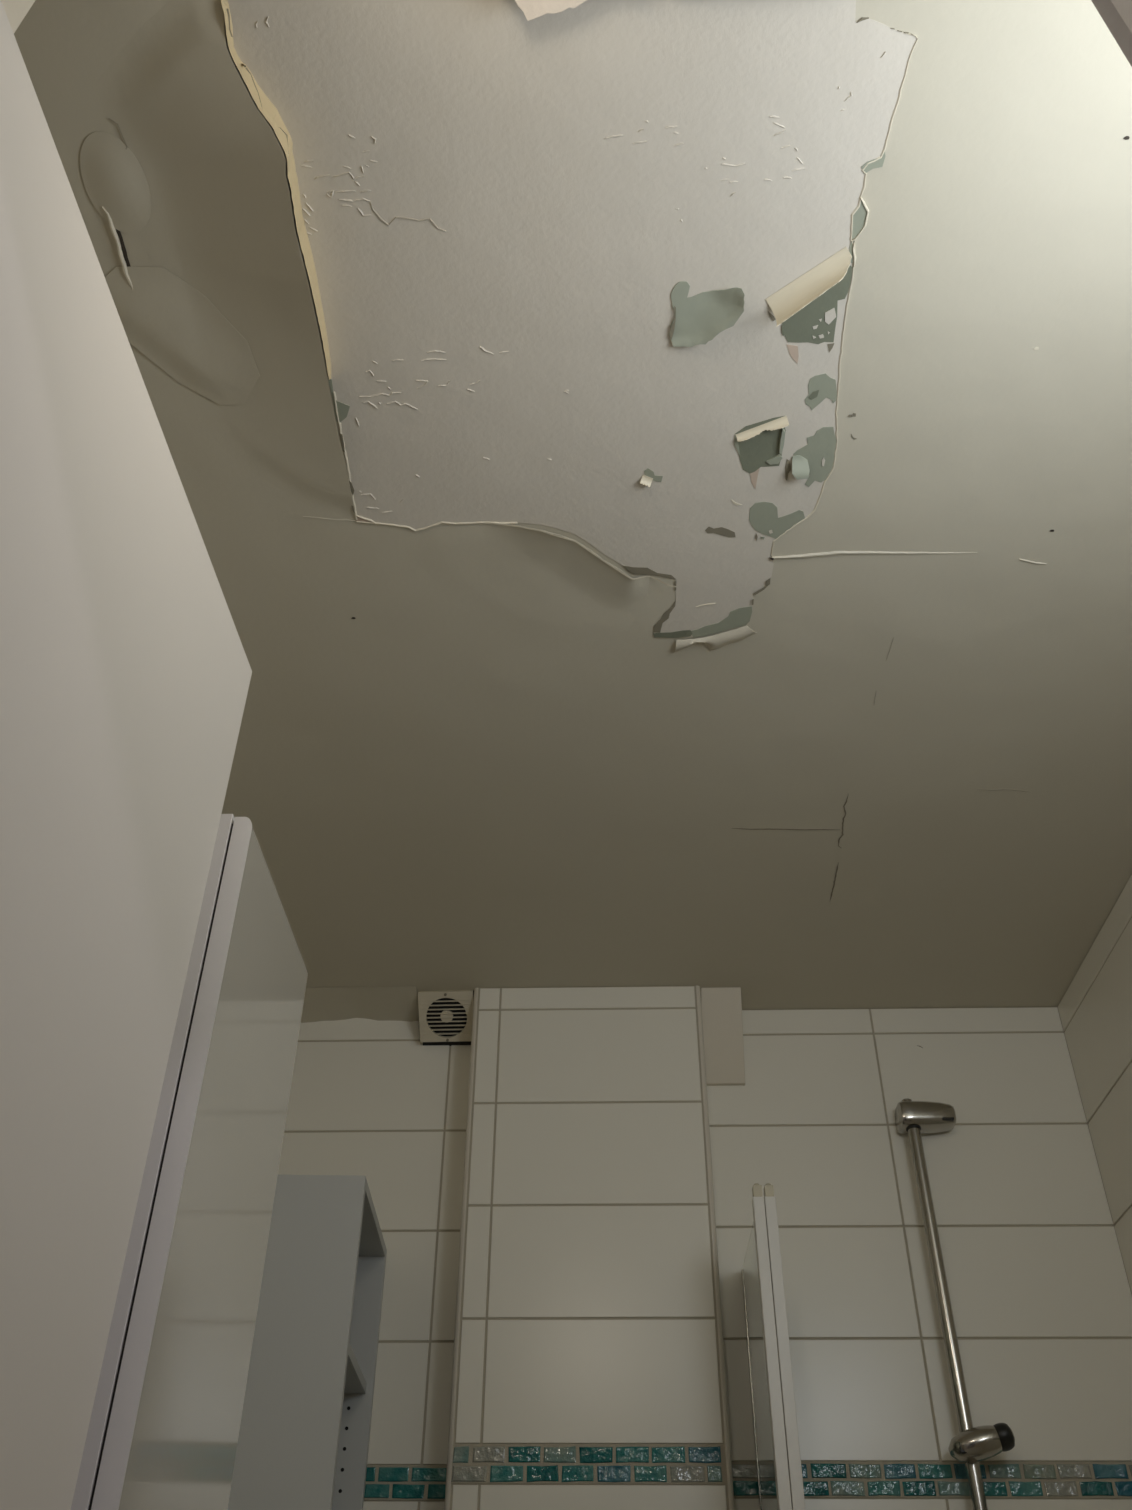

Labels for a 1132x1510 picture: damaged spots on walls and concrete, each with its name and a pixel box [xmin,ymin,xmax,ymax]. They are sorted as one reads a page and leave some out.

flaking render [80,0,917,638]